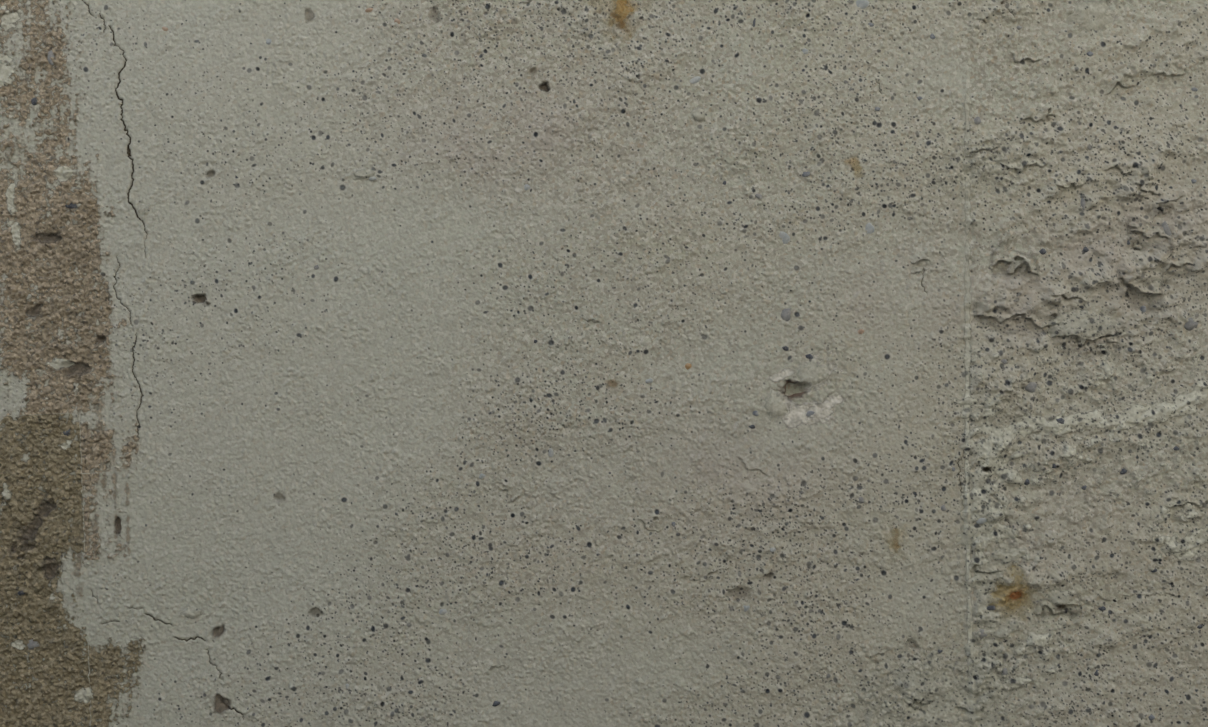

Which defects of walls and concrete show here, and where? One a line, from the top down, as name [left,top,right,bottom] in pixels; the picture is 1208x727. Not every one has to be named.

peeling [0,0,145,727]
crack [82,0,147,441]